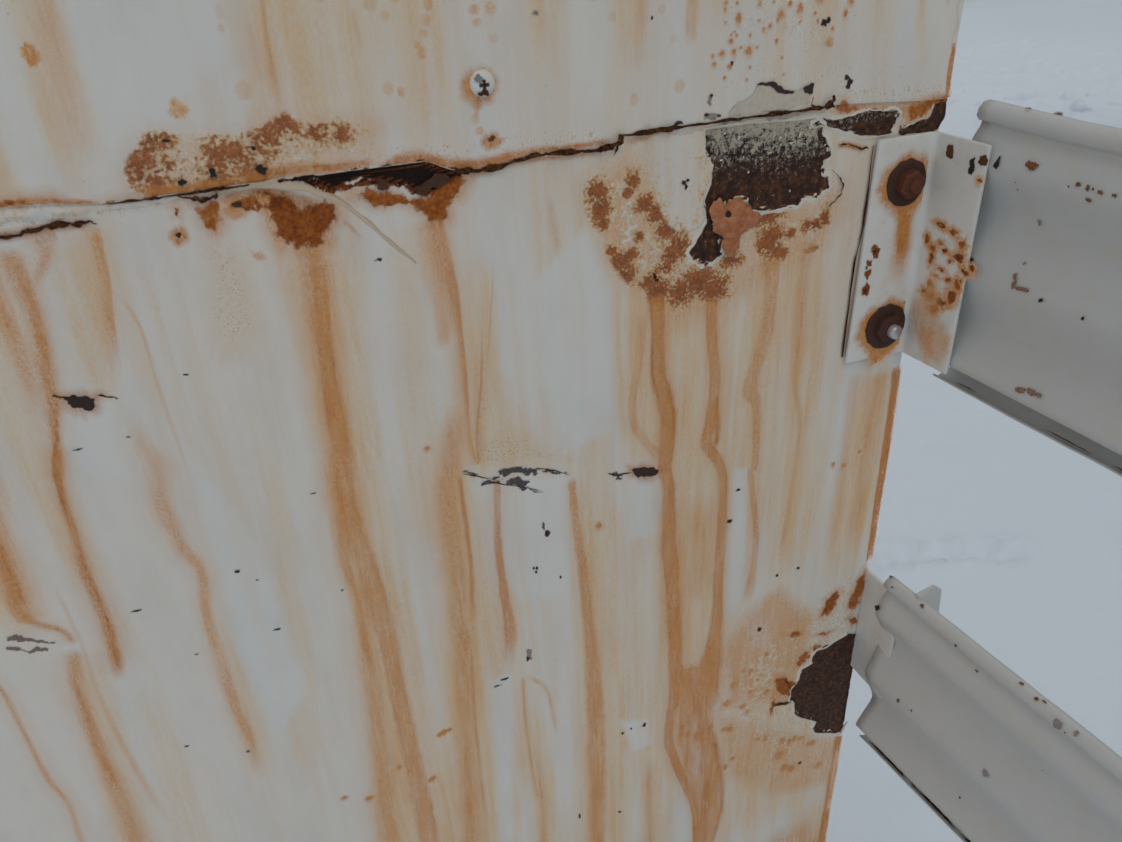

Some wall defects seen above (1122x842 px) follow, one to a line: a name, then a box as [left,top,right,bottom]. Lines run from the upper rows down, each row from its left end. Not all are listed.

crack [0,184,250,240]
corrosion [144,134,603,461]
crack [277,95,836,197]
spalling [634,81,947,269]
corrosion [862,245,880,296]
corrosion [879,153,976,318]
peeling [53,394,118,411]
peeling [608,467,659,478]
corrosion [867,368,901,559]
corrosion [821,575,865,625]
spalling [774,633,856,736]
corrosion [815,736,842,842]